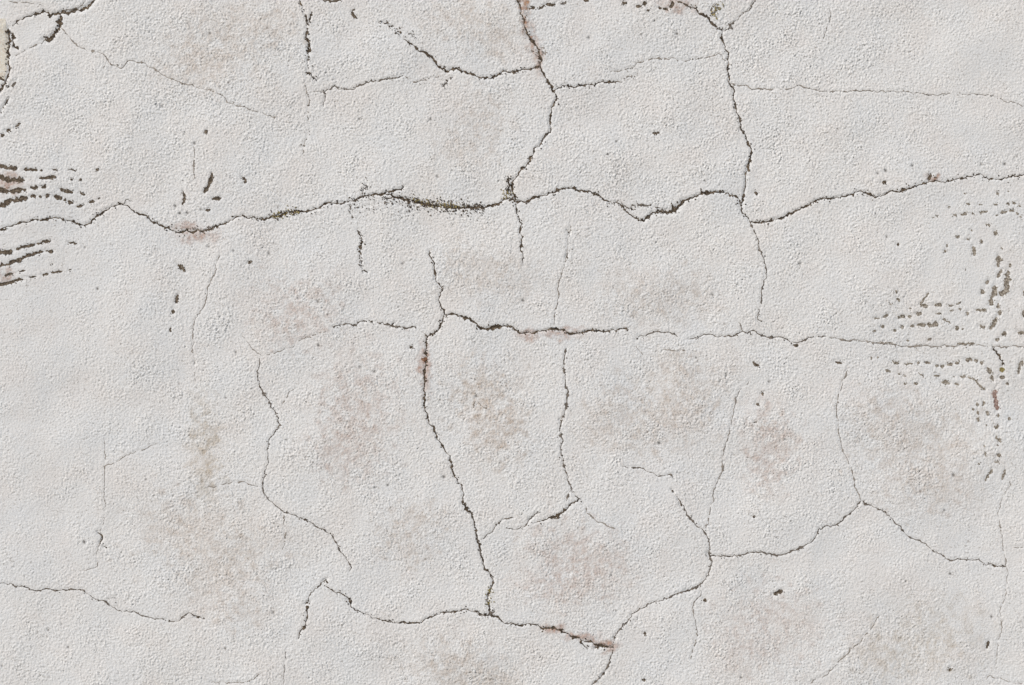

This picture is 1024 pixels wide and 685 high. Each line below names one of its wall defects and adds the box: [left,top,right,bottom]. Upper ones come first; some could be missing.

peeling [0,240,72,286]
peeling [0,164,100,208]
crack [0,0,1024,376]
peeling [932,190,1022,235]
crack [5,441,205,622]
crack [205,225,1021,684]
peeling [870,247,1024,481]